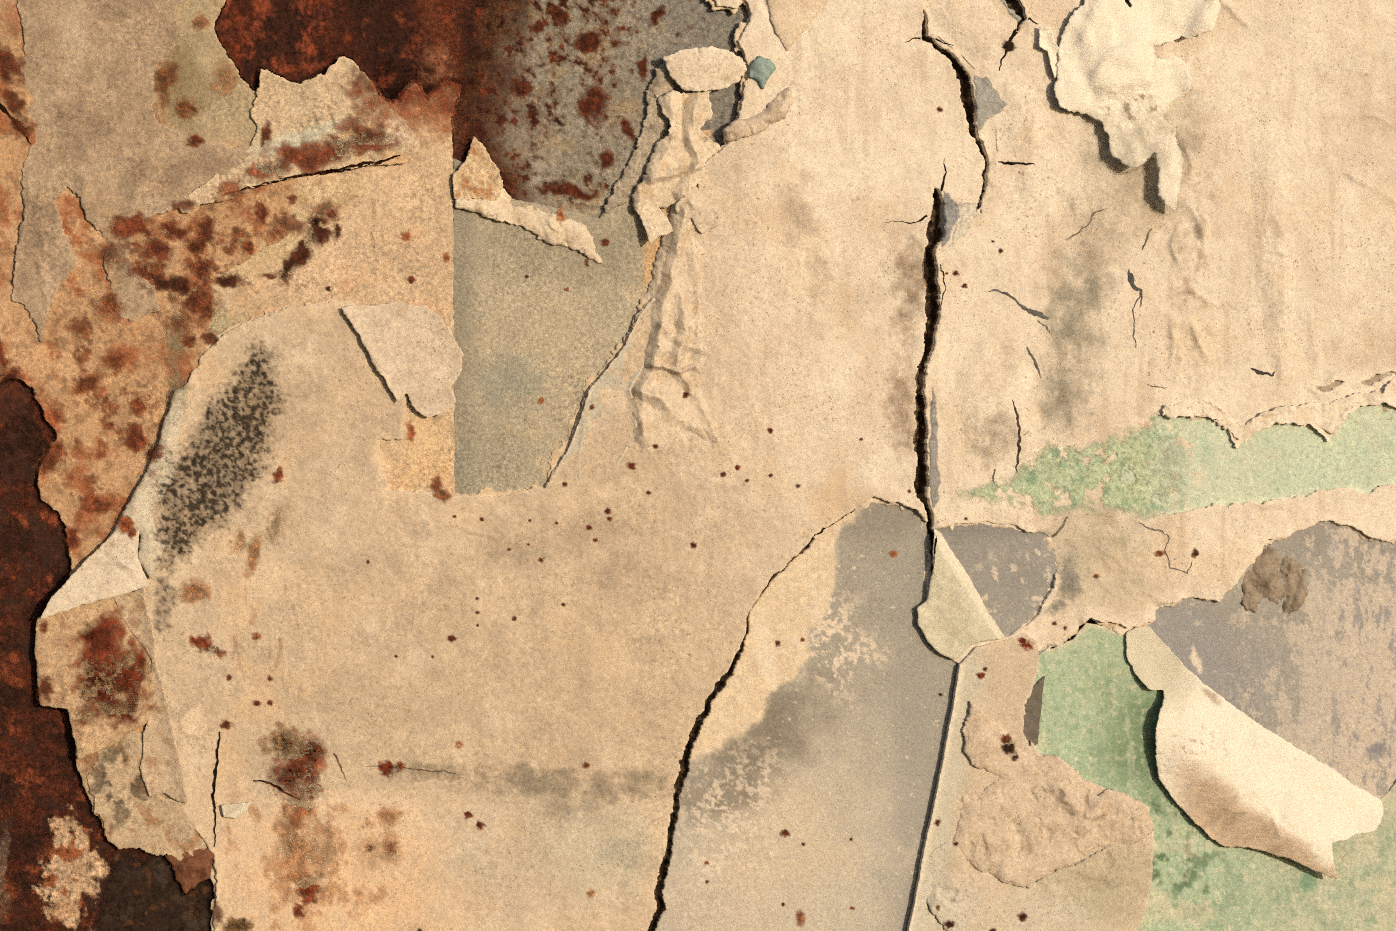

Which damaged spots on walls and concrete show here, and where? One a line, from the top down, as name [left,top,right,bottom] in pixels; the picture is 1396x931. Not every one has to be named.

rust [69,293,162,461]
rust [102,200,255,347]
damp [154,348,281,563]
rust [193,0,666,285]
peeling [208,83,662,495]
crack [886,158,947,573]
crack [905,0,1038,212]
peeling [1039,0,1221,211]
rust [0,395,170,931]
crack [648,511,854,931]
peeling [655,390,1057,931]
peeling [1126,520,1396,879]